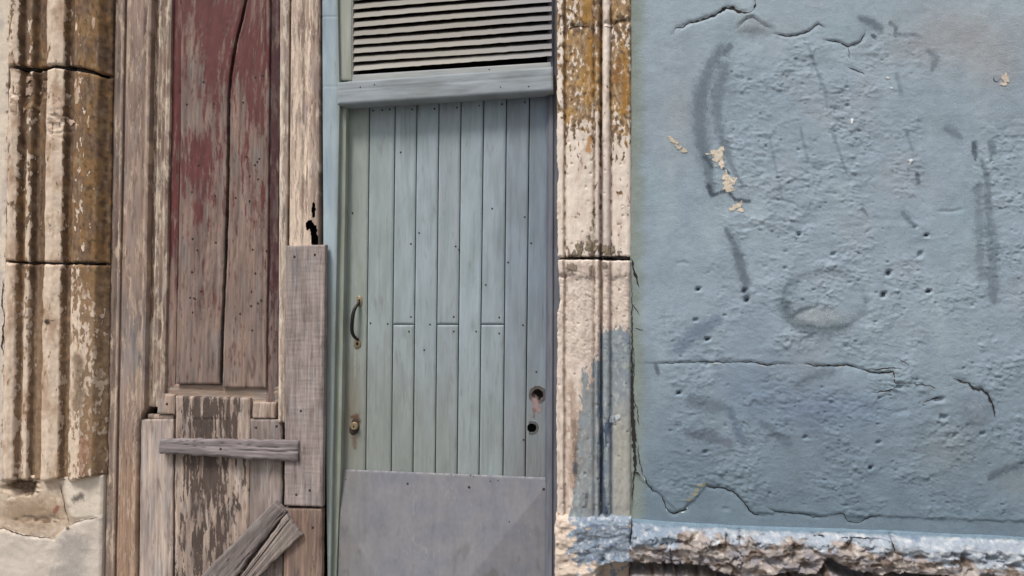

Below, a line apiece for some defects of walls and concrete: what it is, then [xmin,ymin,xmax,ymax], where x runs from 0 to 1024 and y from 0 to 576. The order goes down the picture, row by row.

crack [674,3,865,74]
peeling [705,146,744,212]
leakage [707,184,751,202]
crack [569,255,997,514]